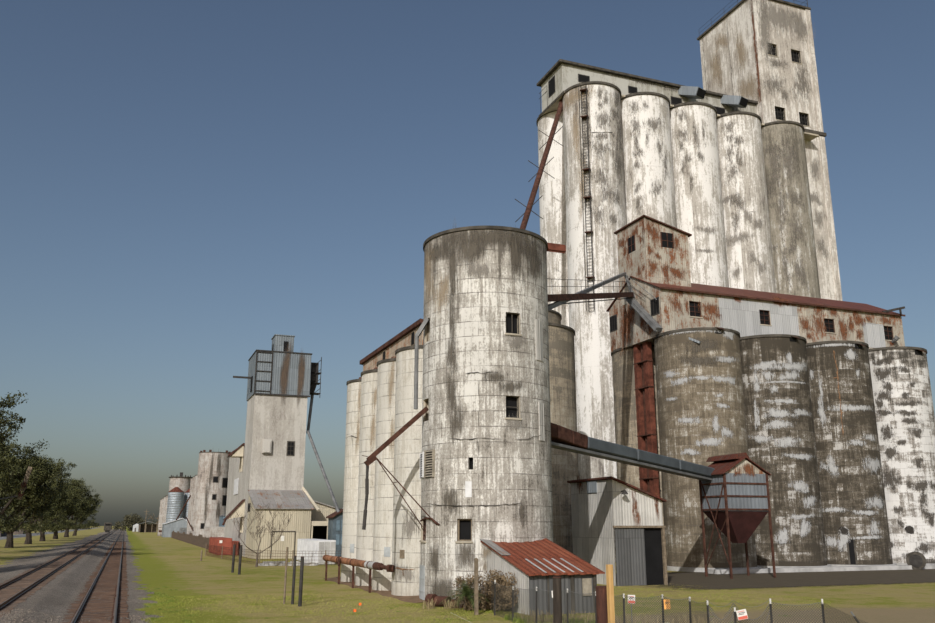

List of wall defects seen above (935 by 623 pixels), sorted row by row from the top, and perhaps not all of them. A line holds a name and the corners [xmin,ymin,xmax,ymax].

leakage [752,0,807,58]
leakage [710,36,748,83]
leakage [723,195,762,246]
rust [618,221,722,321]
leakage [426,229,541,441]
rust [612,301,658,350]
leakage [681,338,724,368]
rust [800,304,896,340]
leakage [444,487,457,515]
leakage [430,547,455,597]
leakage [455,544,473,568]